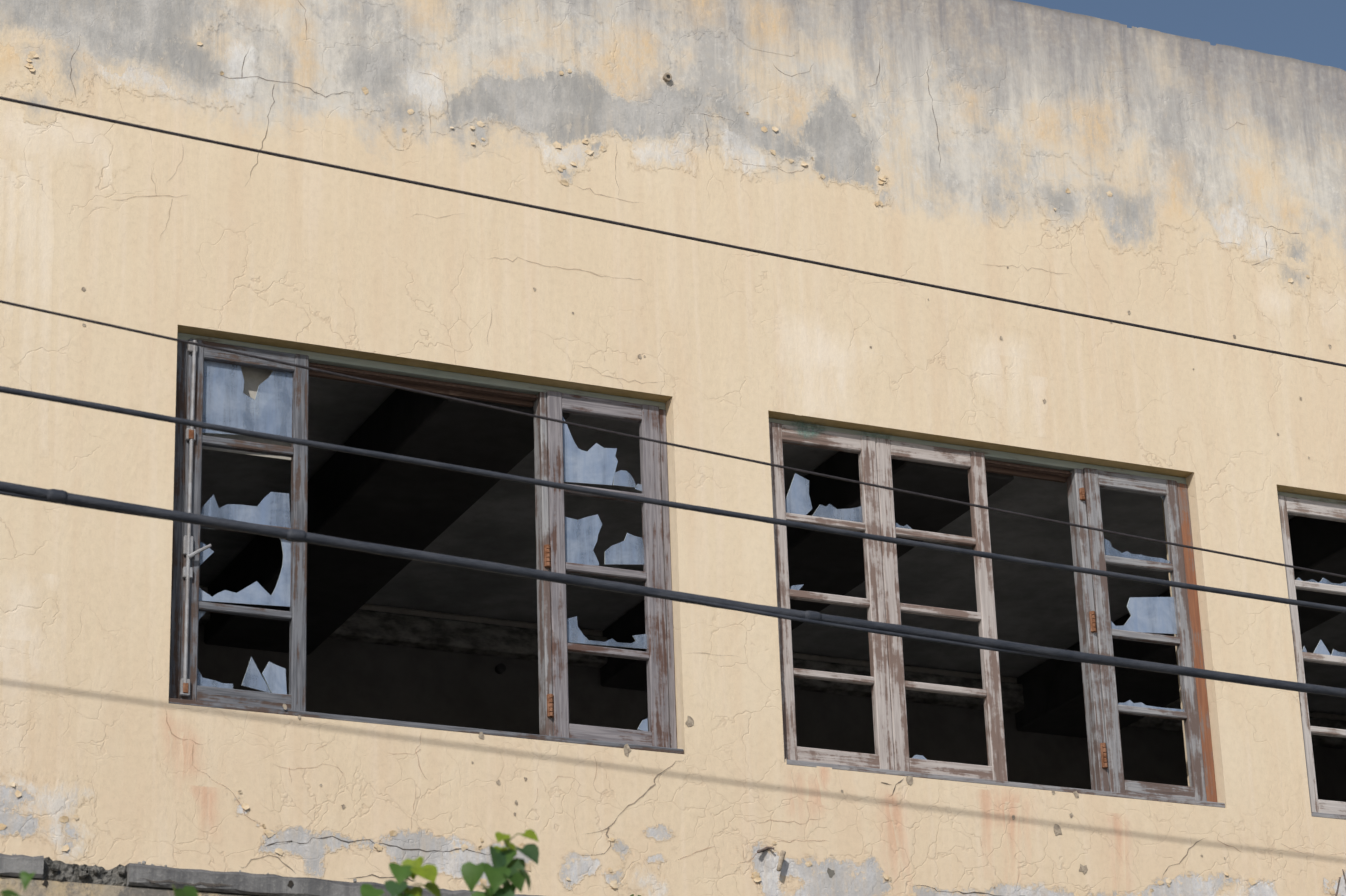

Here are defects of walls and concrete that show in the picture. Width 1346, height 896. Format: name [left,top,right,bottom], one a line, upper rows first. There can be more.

damp [54,0,327,115]
crack [213,54,348,183]
damp [469,0,819,151]
peeling [442,64,894,207]
crack [927,67,941,166]
damp [0,43,137,457]
damp [1146,136,1346,341]
spalling [38,813,127,887]
crack [142,836,490,894]
peeling [226,790,533,889]
crack [578,755,687,856]
peeling [746,840,1279,896]